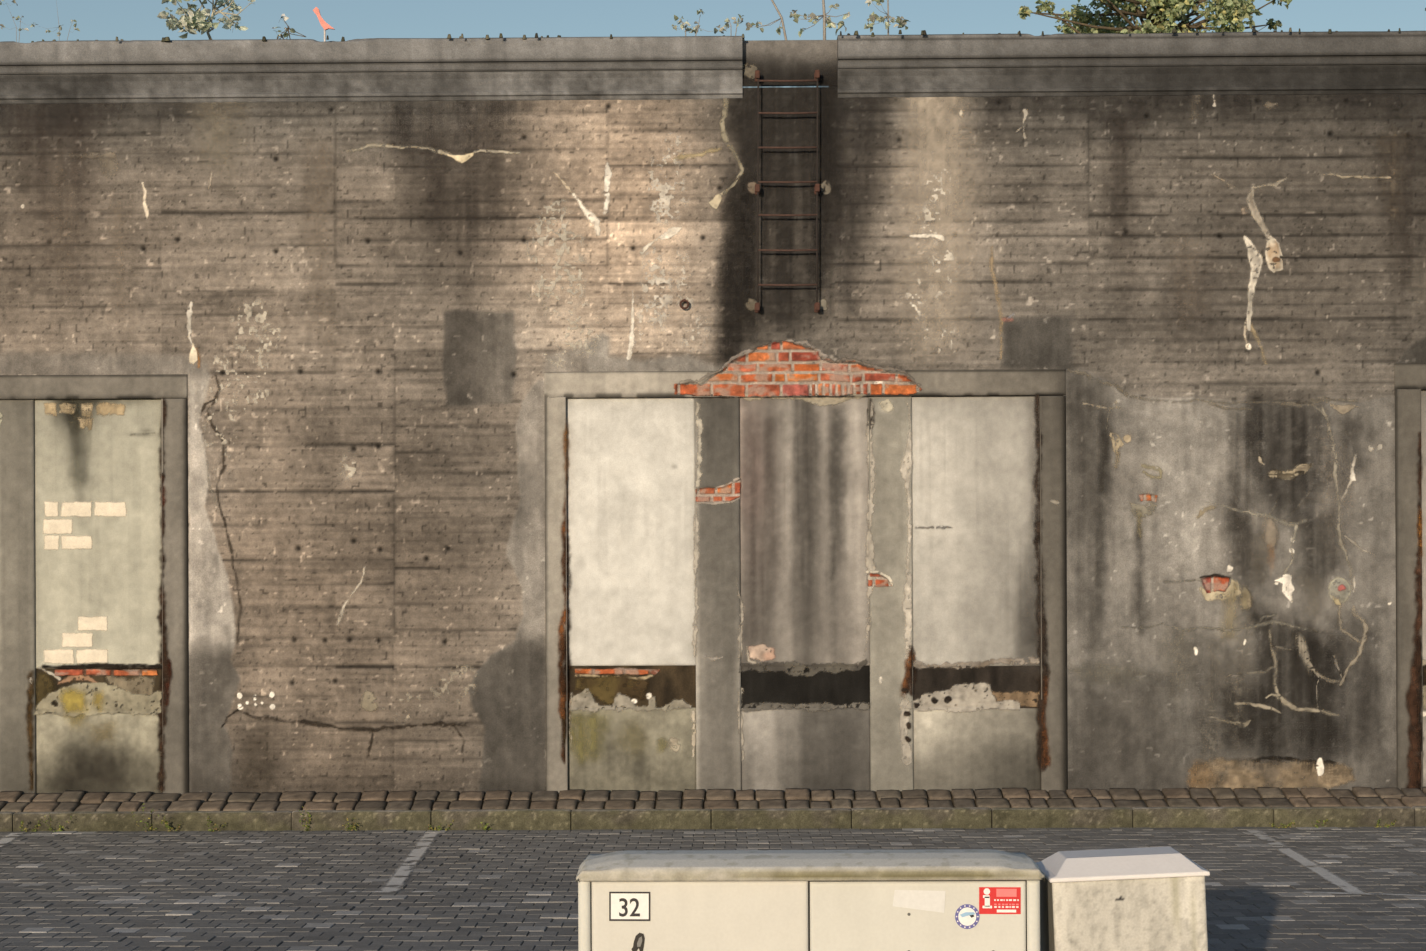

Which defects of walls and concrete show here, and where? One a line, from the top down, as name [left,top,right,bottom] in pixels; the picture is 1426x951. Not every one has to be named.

water stain [721,69,876,357]
spalling [1241,180,1283,354]
crack [1072,371,1144,419]
flaking render [29,616,162,717]
crack [202,375,241,643]
crack [221,708,466,756]
flaking render [568,668,696,757]
spalling [674,339,1039,765]
crack [1139,396,1368,727]
water stain [1210,612,1366,762]
water stain [1247,397,1349,577]
rust [1406,433,1422,789]